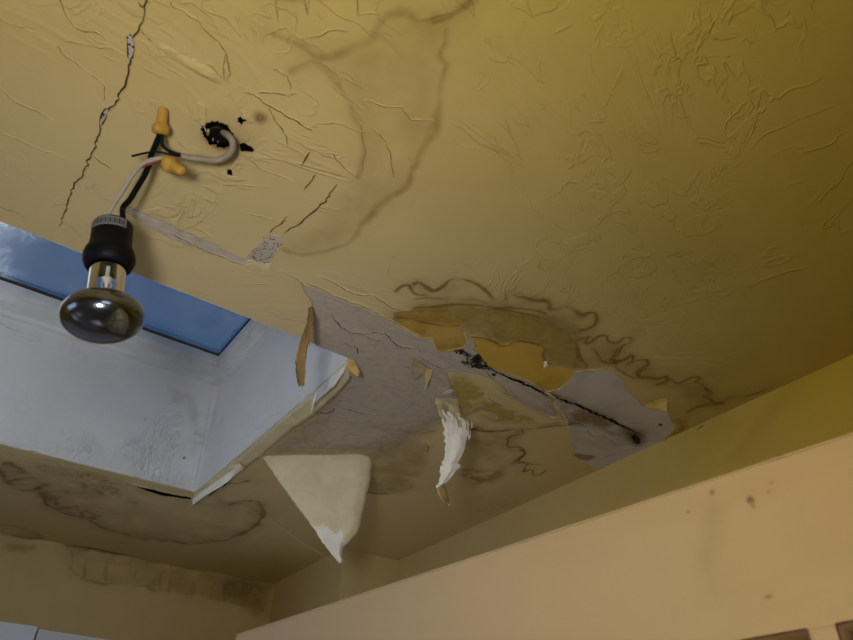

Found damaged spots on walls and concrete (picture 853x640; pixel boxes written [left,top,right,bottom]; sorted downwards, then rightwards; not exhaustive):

crack [56,0,397,234]
peeling [126,207,284,270]
crack [277,269,421,354]
water stain [394,280,482,321]
water stain [454,350,496,376]
water stain [494,297,724,405]
peeling [192,280,677,564]
crack [490,367,640,434]
crack [125,482,226,500]